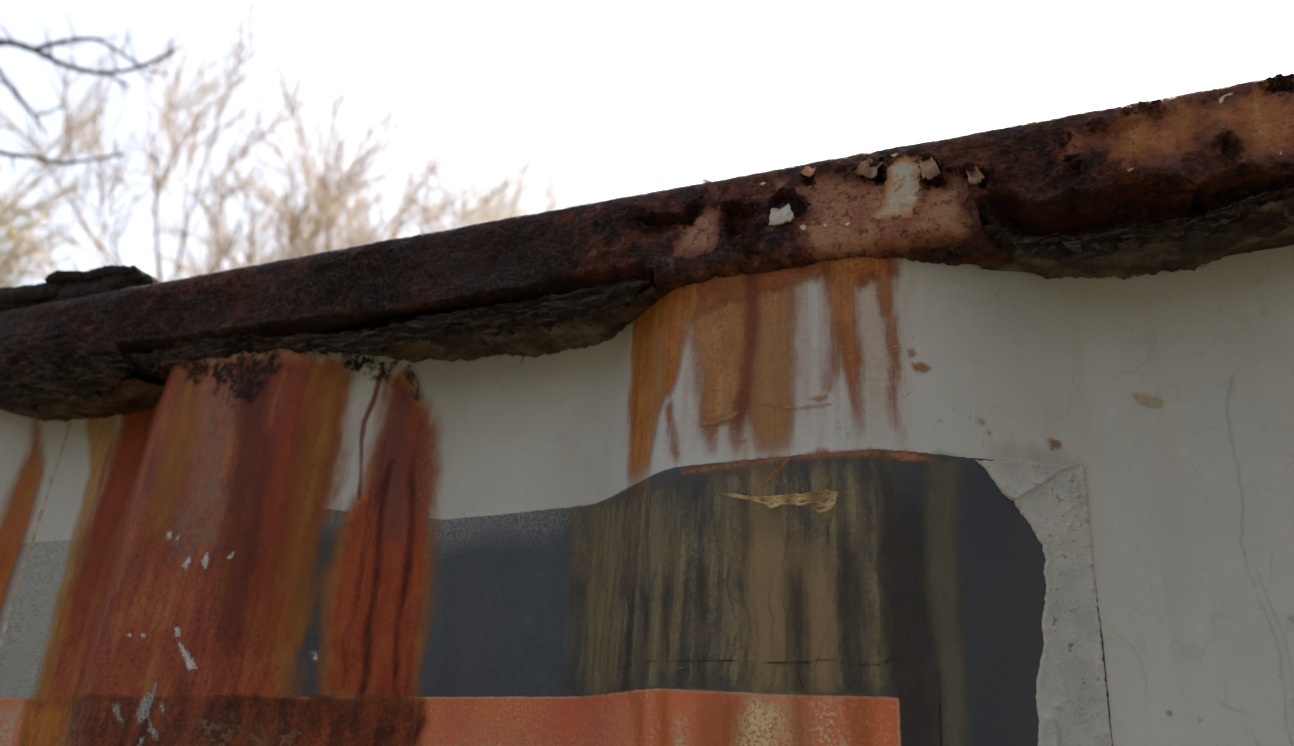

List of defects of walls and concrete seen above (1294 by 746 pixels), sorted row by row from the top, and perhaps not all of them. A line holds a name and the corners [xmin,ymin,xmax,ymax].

peeling [854,158,883,179]
peeling [919,156,941,180]
peeling [966,166,985,185]
peeling [769,204,795,226]
rust [977,185,1294,280]
rust [0,256,934,746]
spalling [716,460,838,514]
peeling [975,439,1112,746]